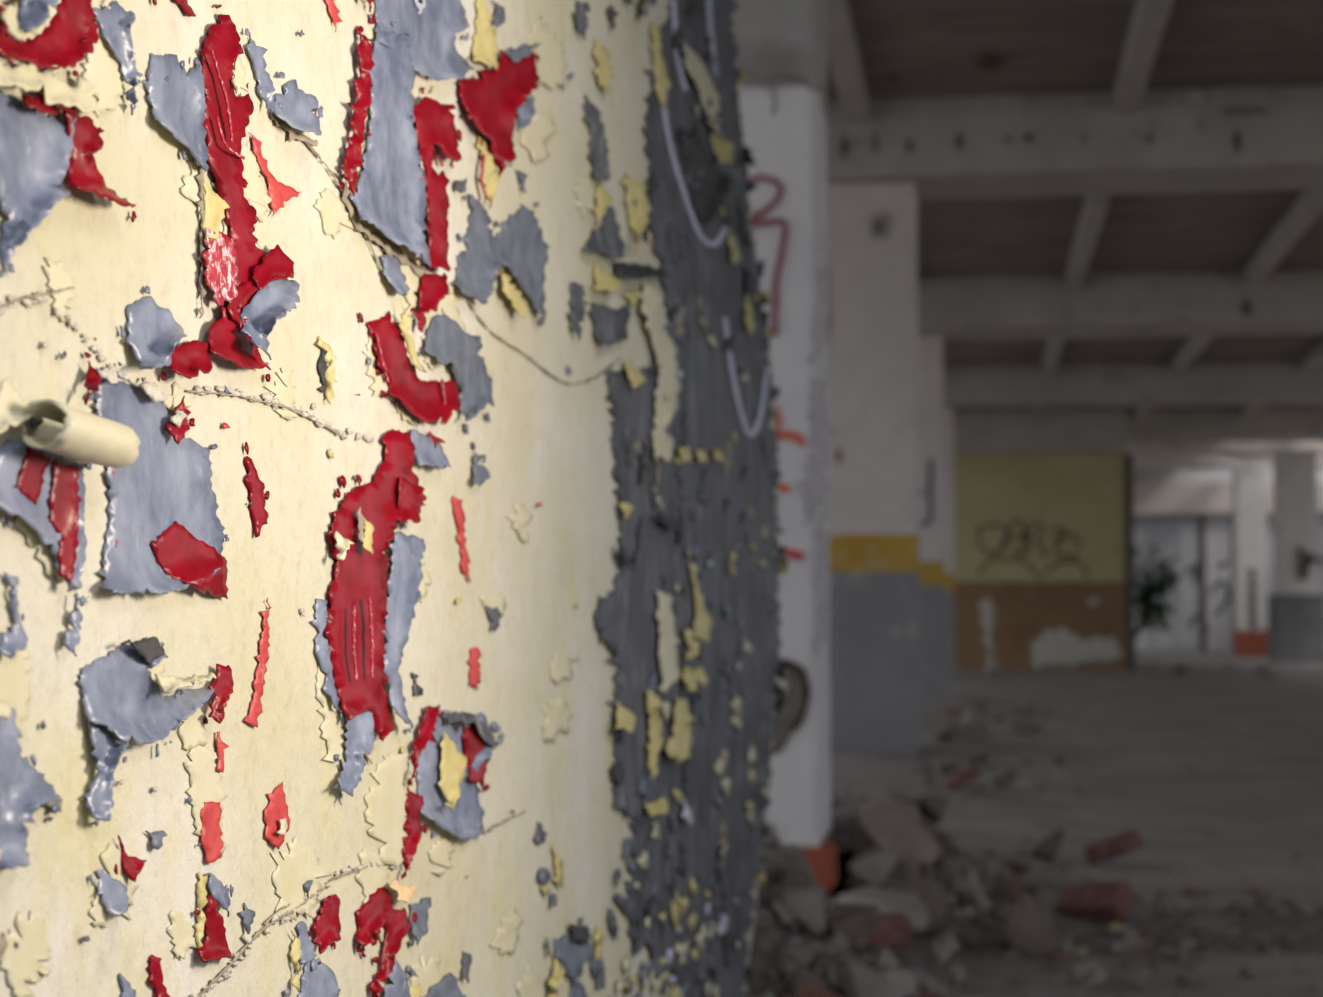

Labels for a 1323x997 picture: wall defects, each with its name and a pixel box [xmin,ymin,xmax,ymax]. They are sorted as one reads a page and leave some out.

crack [0,287,130,380]
crack [468,301,621,384]
crack [185,385,374,443]
peeling [0,0,338,997]
peeling [264,0,574,997]
peeling [489,0,810,997]
flaking render [978,597,1001,670]
flaking render [1032,627,1124,670]
crack [189,859,400,997]